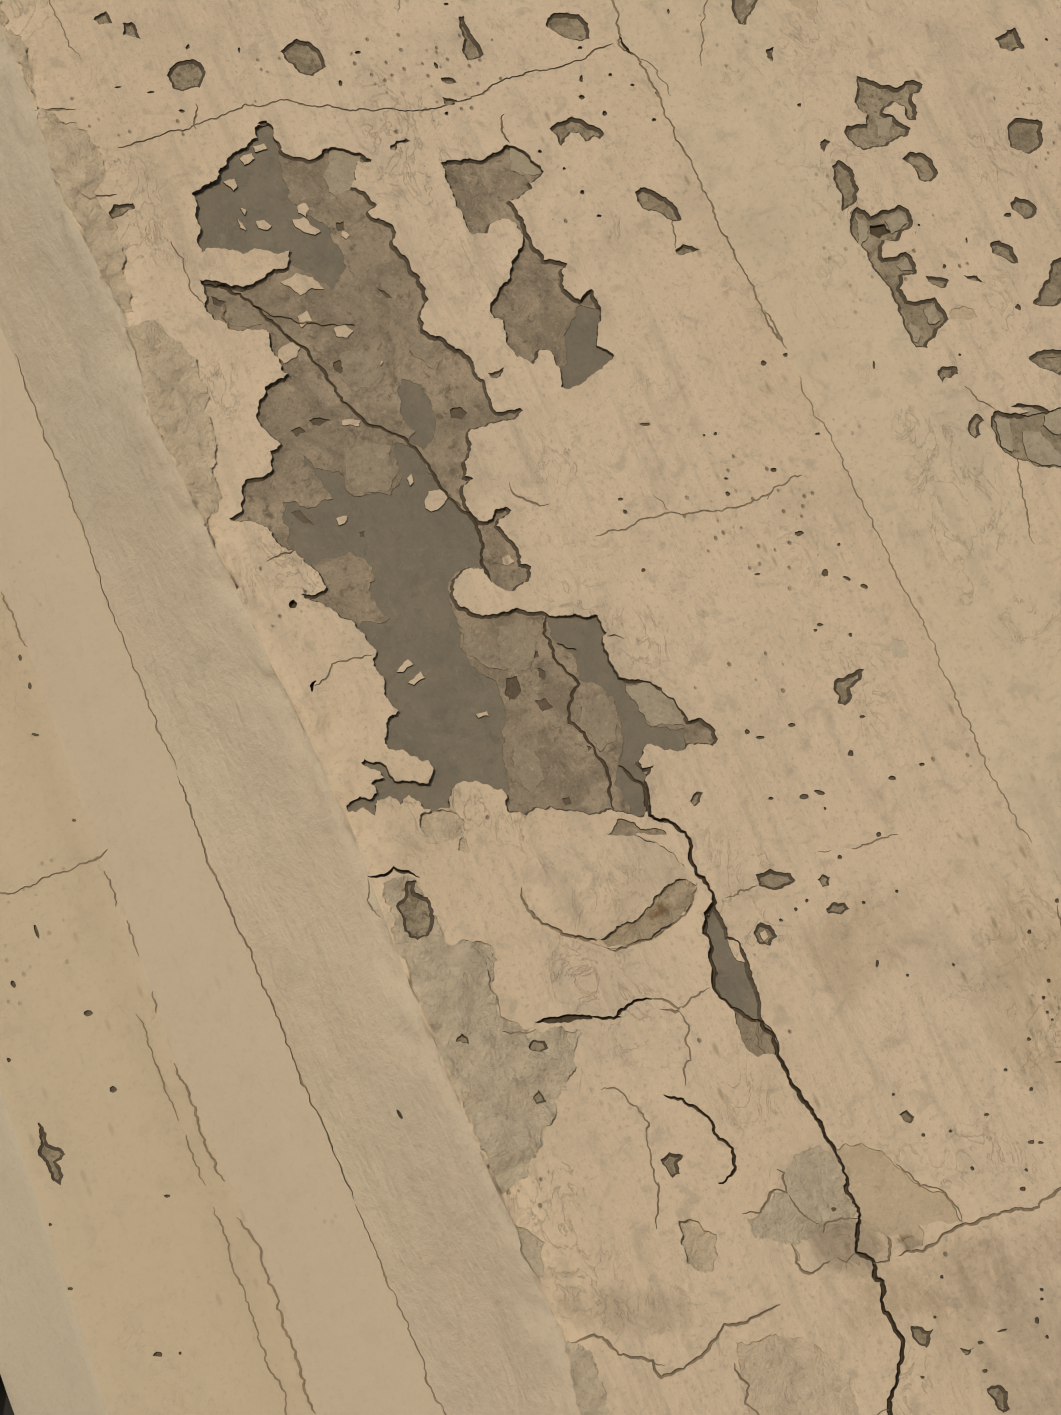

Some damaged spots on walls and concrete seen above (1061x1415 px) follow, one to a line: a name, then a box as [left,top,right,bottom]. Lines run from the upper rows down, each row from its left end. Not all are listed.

peeling [820,76,982,348]
peeling [0,0,718,853]
crack [118,0,1034,843]
peeling [968,403,1061,468]
spalling [382,875,581,1194]
crack [487,617,1061,1415]
peeling [747,1143,961,1262]
spalling [565,1342,613,1415]